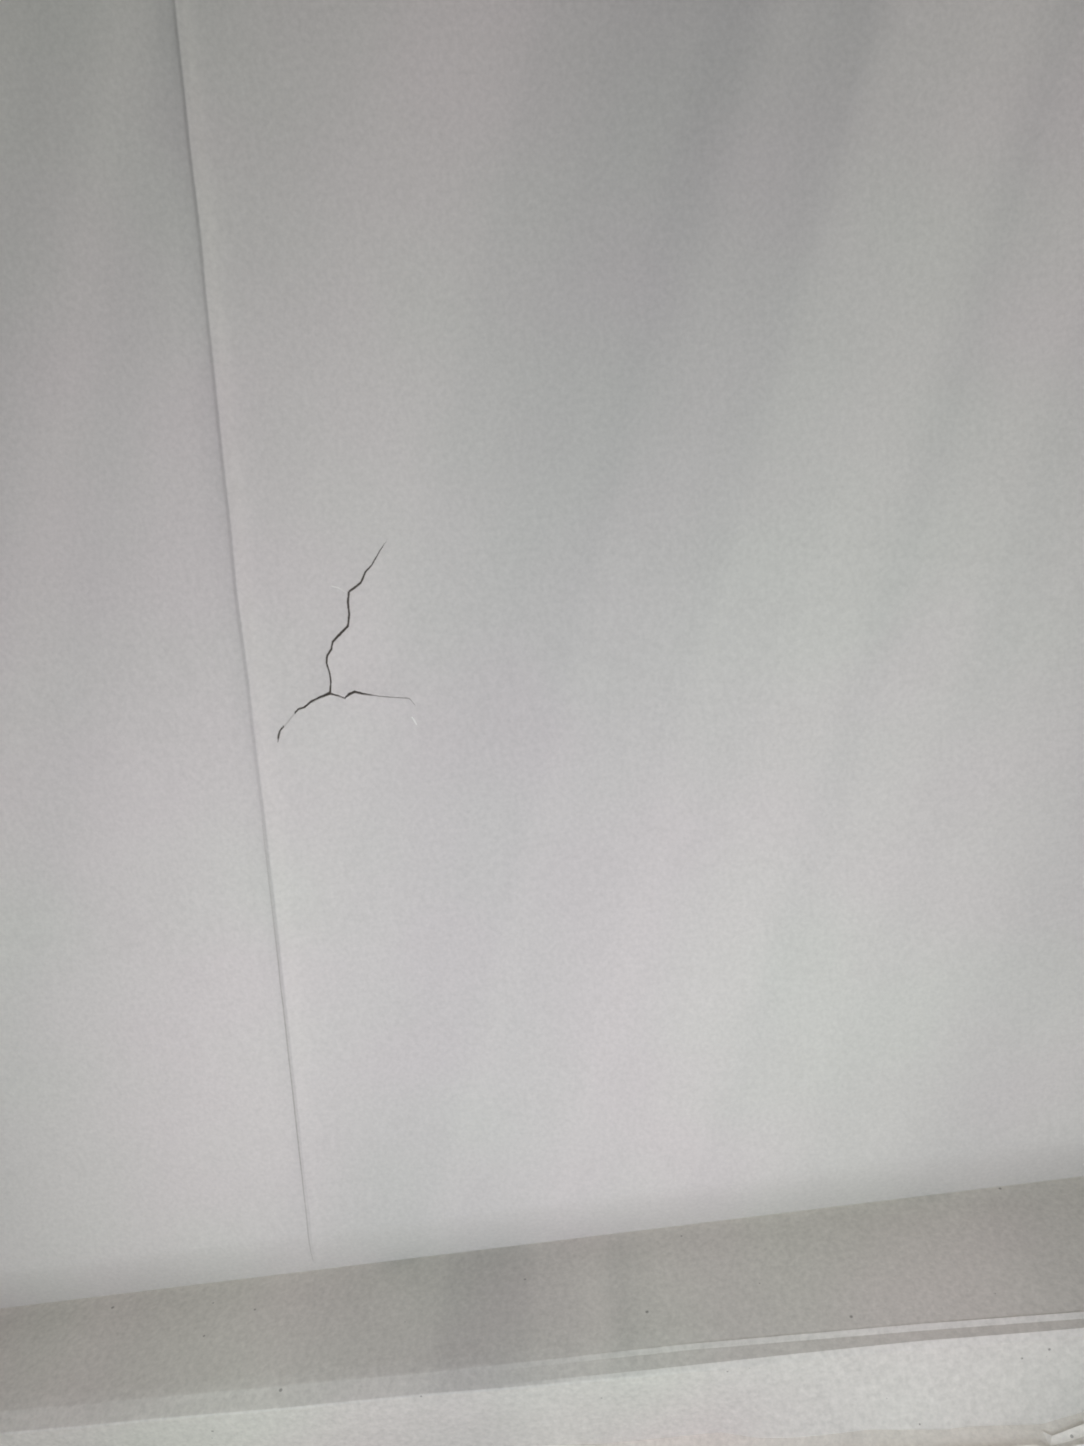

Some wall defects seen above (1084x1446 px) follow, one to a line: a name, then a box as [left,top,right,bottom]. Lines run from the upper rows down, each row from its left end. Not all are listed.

crack [266,540,443,809]
crack [262,825,313,1259]